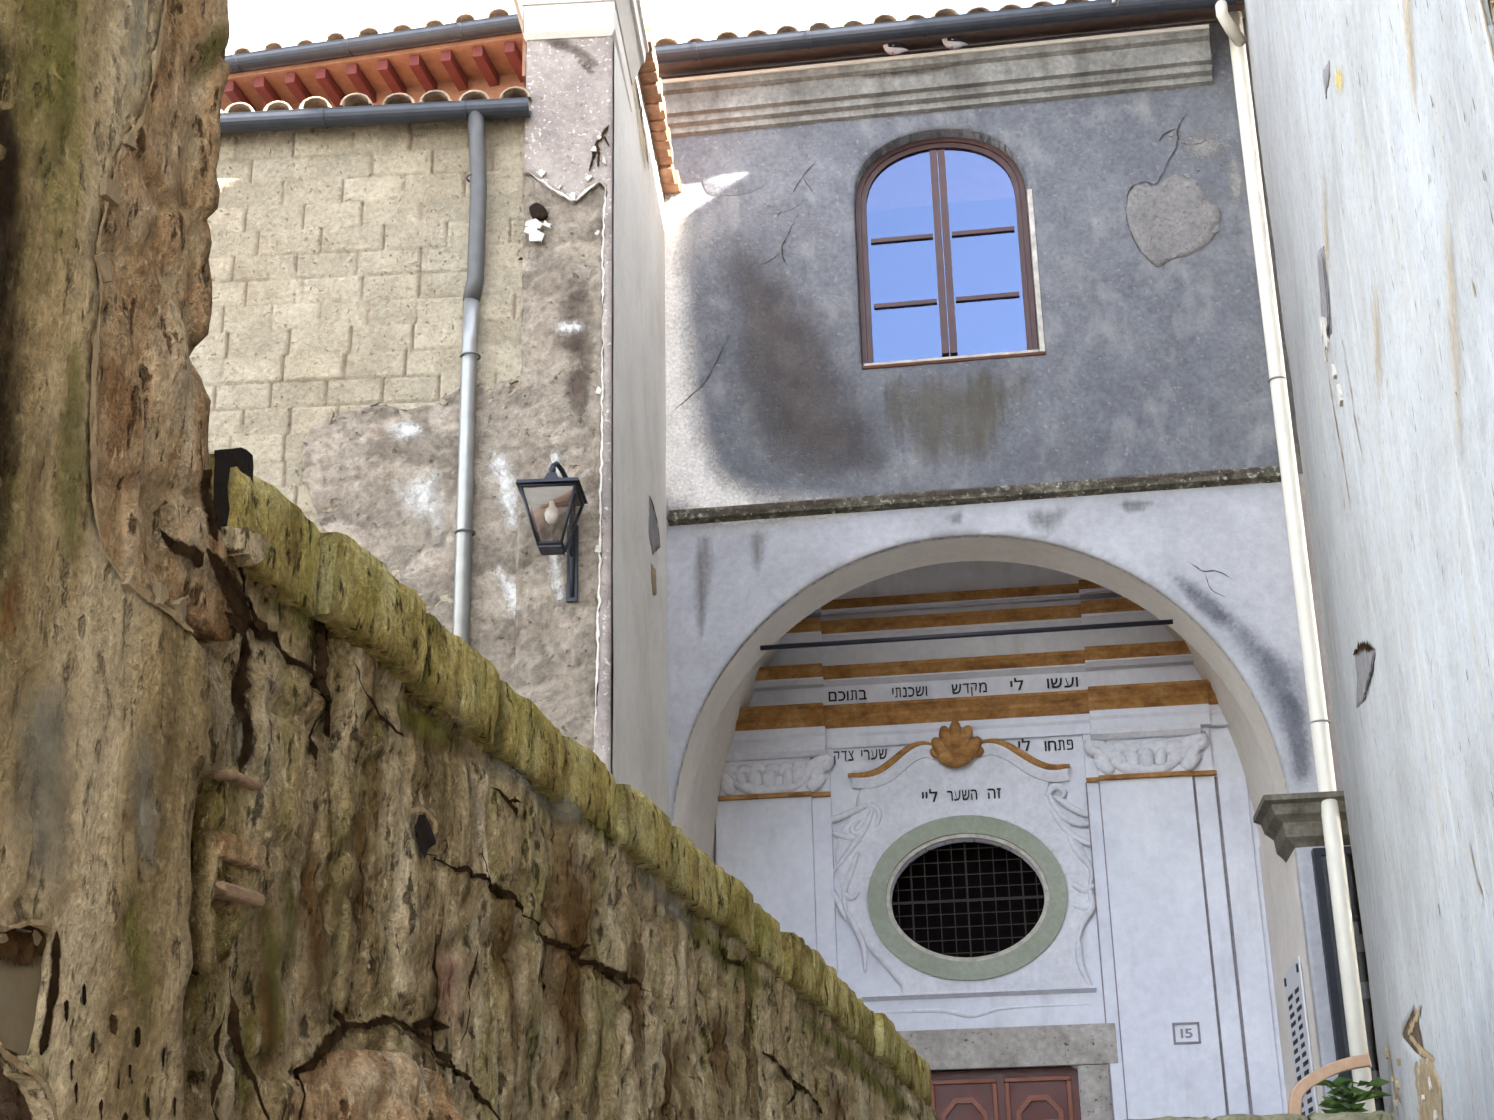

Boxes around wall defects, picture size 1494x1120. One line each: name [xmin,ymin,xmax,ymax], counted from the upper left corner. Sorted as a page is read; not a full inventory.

peeling [1126,133,1243,267]
water stain [740,266,869,464]
water stain [892,375,1005,457]
crack [160,469,404,773]
water stain [1186,586,1227,621]
water stain [1242,631,1307,771]
flaking render [1353,641,1376,708]
peeling [33,930,42,946]
crack [426,848,645,992]
crack [210,928,501,1120]